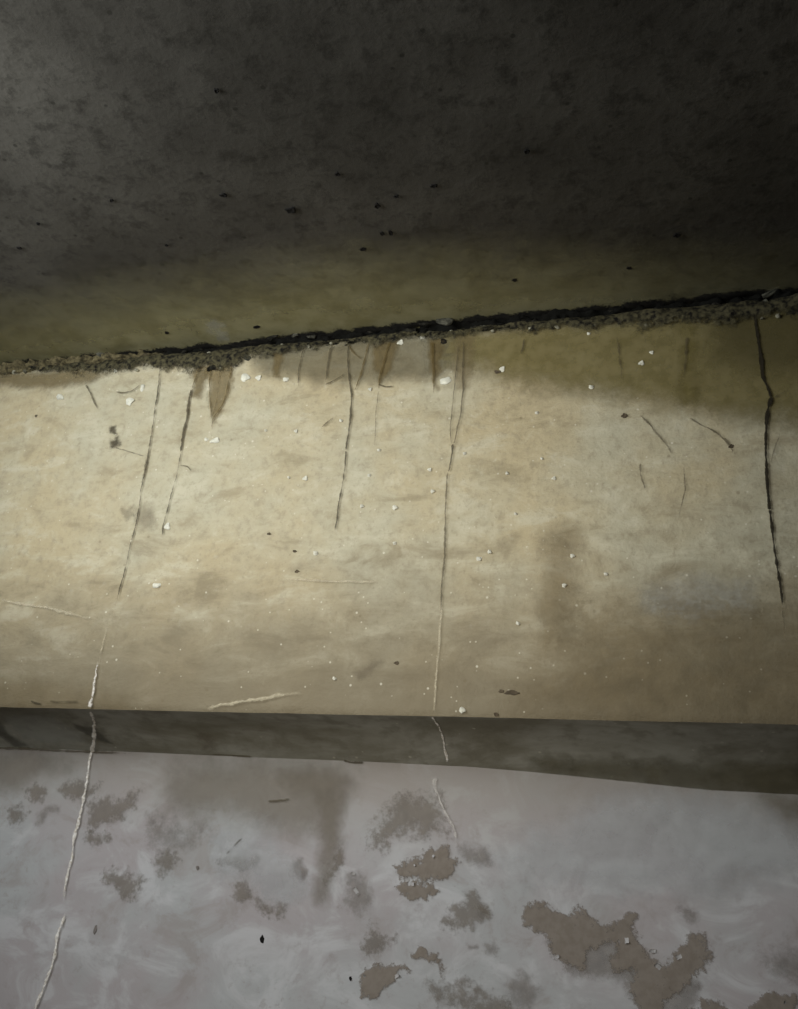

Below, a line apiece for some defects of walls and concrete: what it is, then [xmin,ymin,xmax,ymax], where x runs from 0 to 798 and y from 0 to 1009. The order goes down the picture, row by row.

crack [118,353,160,594]
crack [162,368,200,534]
crack [326,342,392,528]
damp [0,287,798,422]
crack [754,316,783,603]
crack [431,343,464,837]
crack [0,665,114,1009]
peeling [349,932,444,999]
peeling [392,845,458,901]
peeling [521,900,713,1009]
peeling [691,997,727,1009]
peeling [749,991,798,1009]